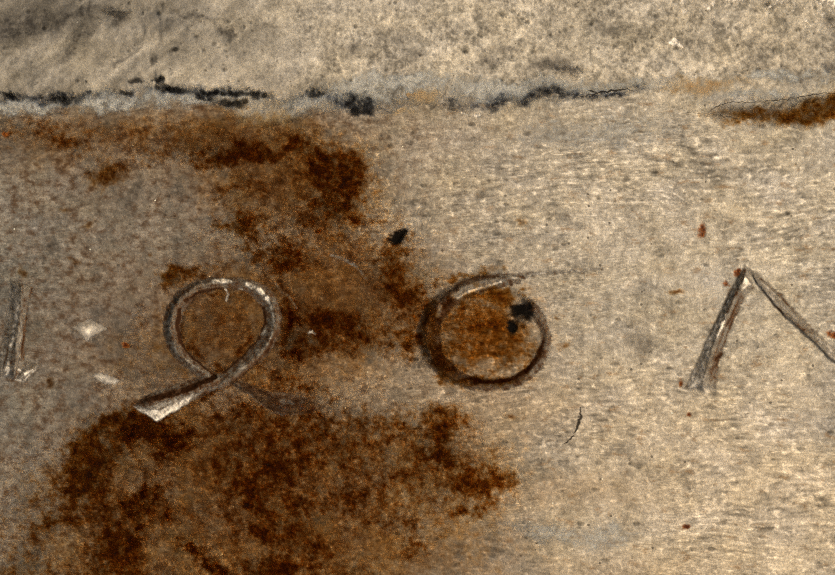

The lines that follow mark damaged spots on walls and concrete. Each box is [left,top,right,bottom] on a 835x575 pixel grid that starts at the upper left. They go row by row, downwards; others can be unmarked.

rust [727,93,835,126]
rust [90,164,126,185]
rust [195,134,366,233]
rust [216,210,305,274]
rust [162,265,204,288]
rust [280,298,374,362]
rust [381,244,540,386]
rust [30,404,207,575]
rust [202,371,517,575]
rust [185,542,227,575]